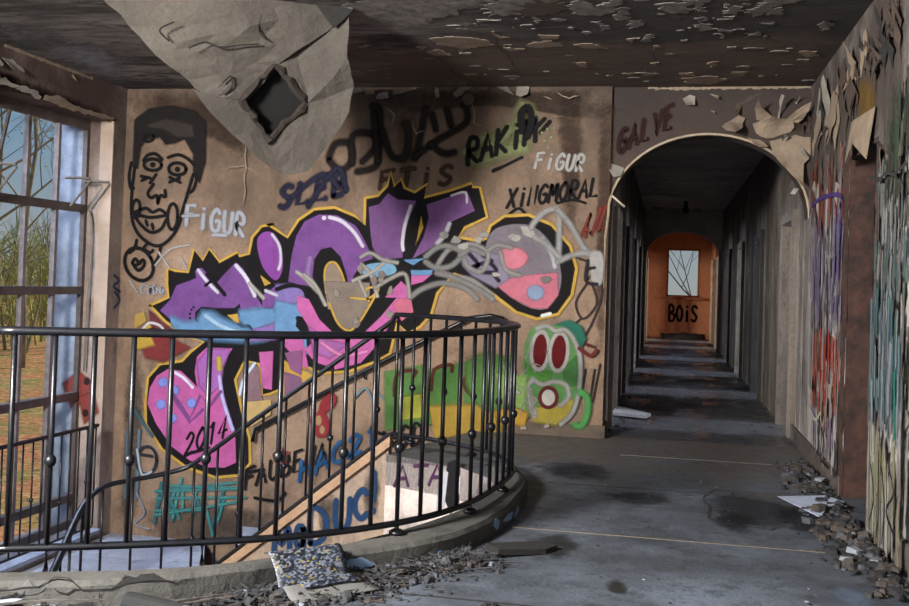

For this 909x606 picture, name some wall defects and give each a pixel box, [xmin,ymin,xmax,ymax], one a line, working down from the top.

peeling [0,44,93,81]
peeling [0,77,114,120]
peeling [340,0,902,497]
flaking render [870,141,909,452]
water stain [550,463,608,478]
water stain [611,493,666,504]
water stain [717,496,819,531]
water stain [541,536,575,556]
crack [0,573,191,606]
crack [215,565,259,595]